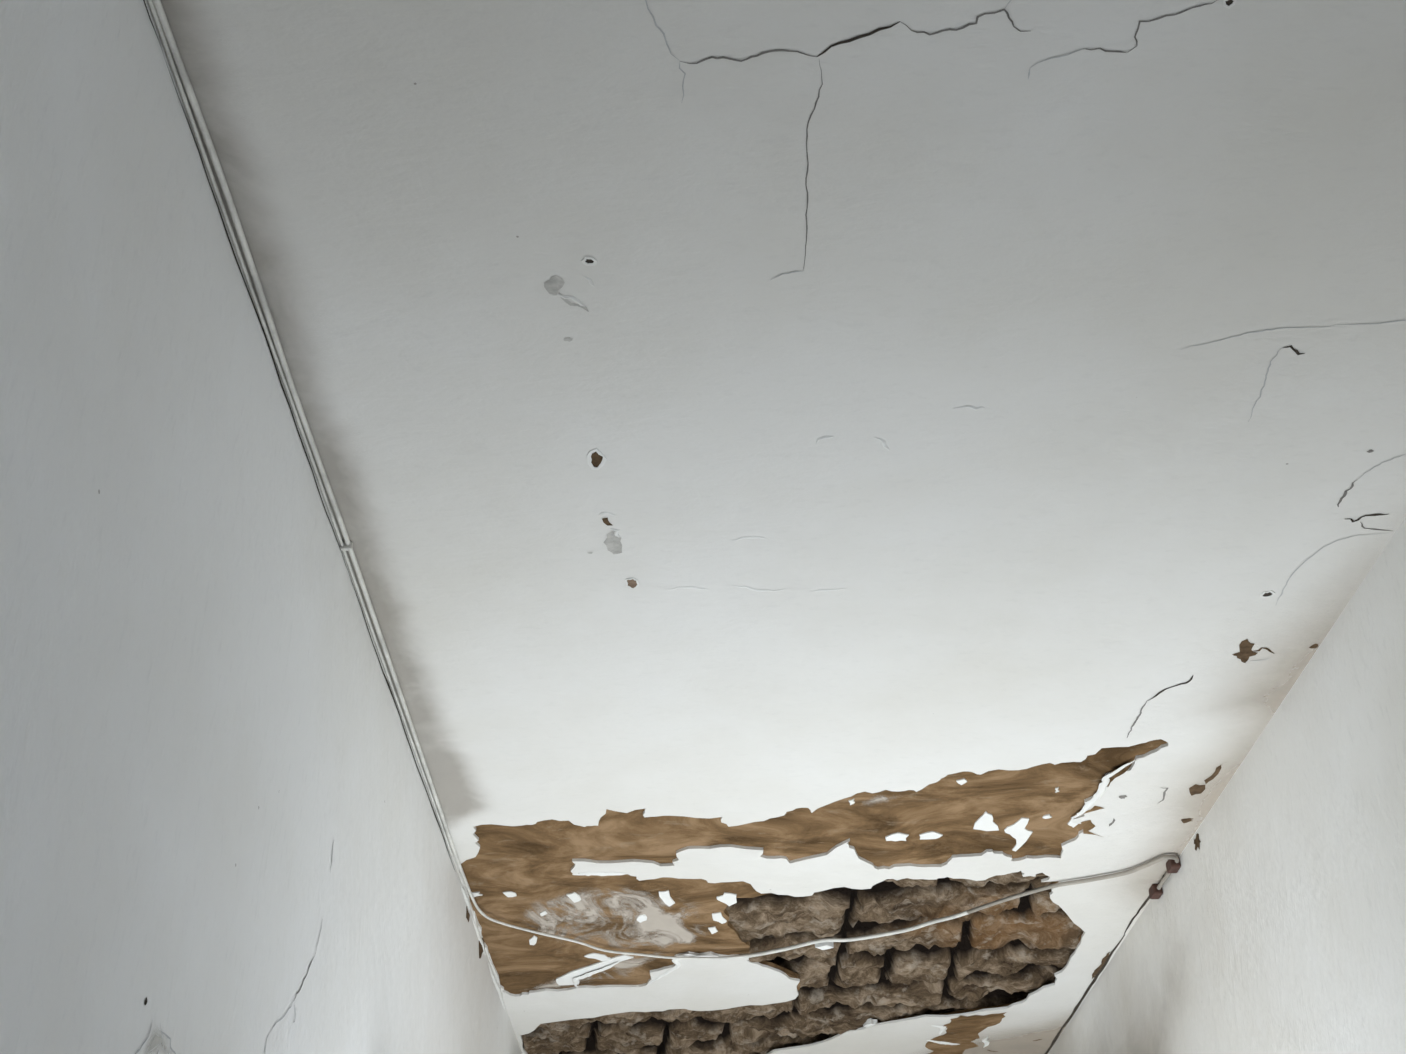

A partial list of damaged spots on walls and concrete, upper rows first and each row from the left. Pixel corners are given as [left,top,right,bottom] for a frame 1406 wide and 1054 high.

crack [645,0,1217,280]
crack [1127,676,1193,738]
spalling [1233,639,1275,663]
damp [1264,644,1318,712]
damp [1177,764,1241,857]
flaking render [461,739,1168,1054]
damp [963,1026,1066,1054]